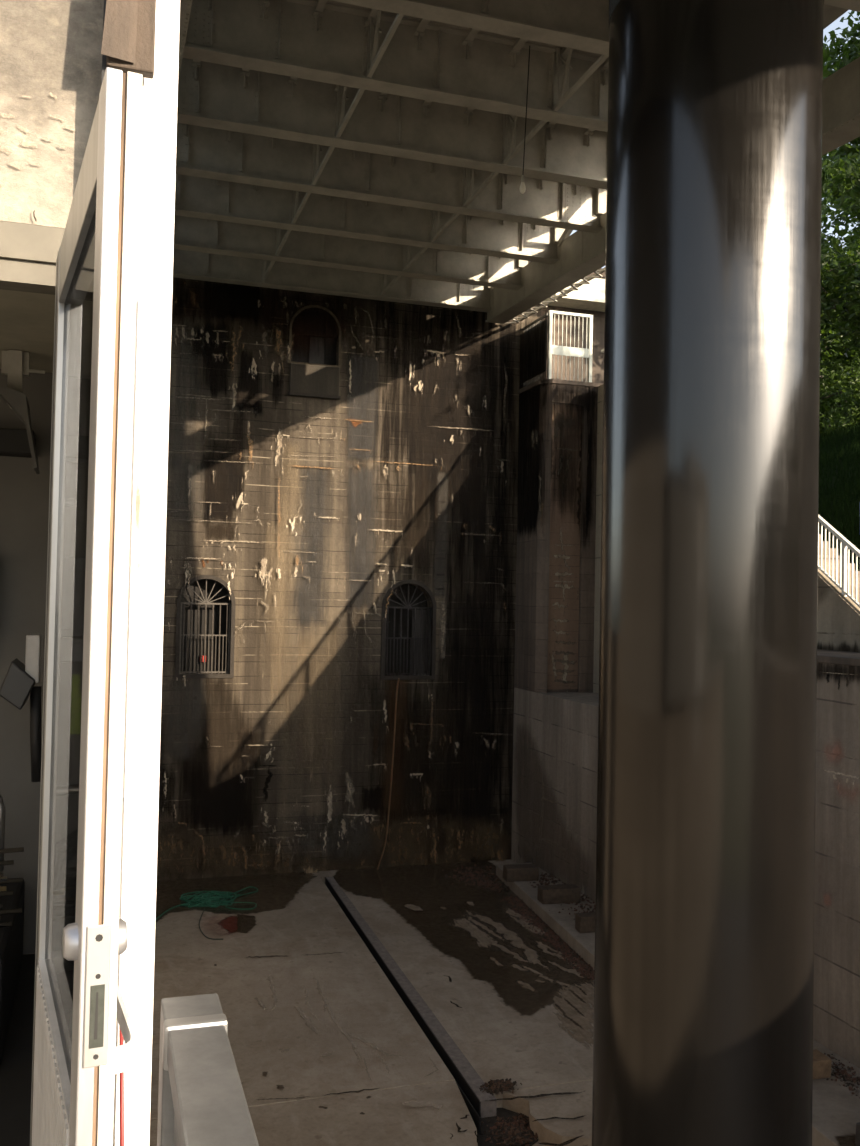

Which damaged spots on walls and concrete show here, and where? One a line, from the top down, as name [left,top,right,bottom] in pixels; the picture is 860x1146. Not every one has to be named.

leakage [155,279,598,1047]
crack [450,1092,584,1146]